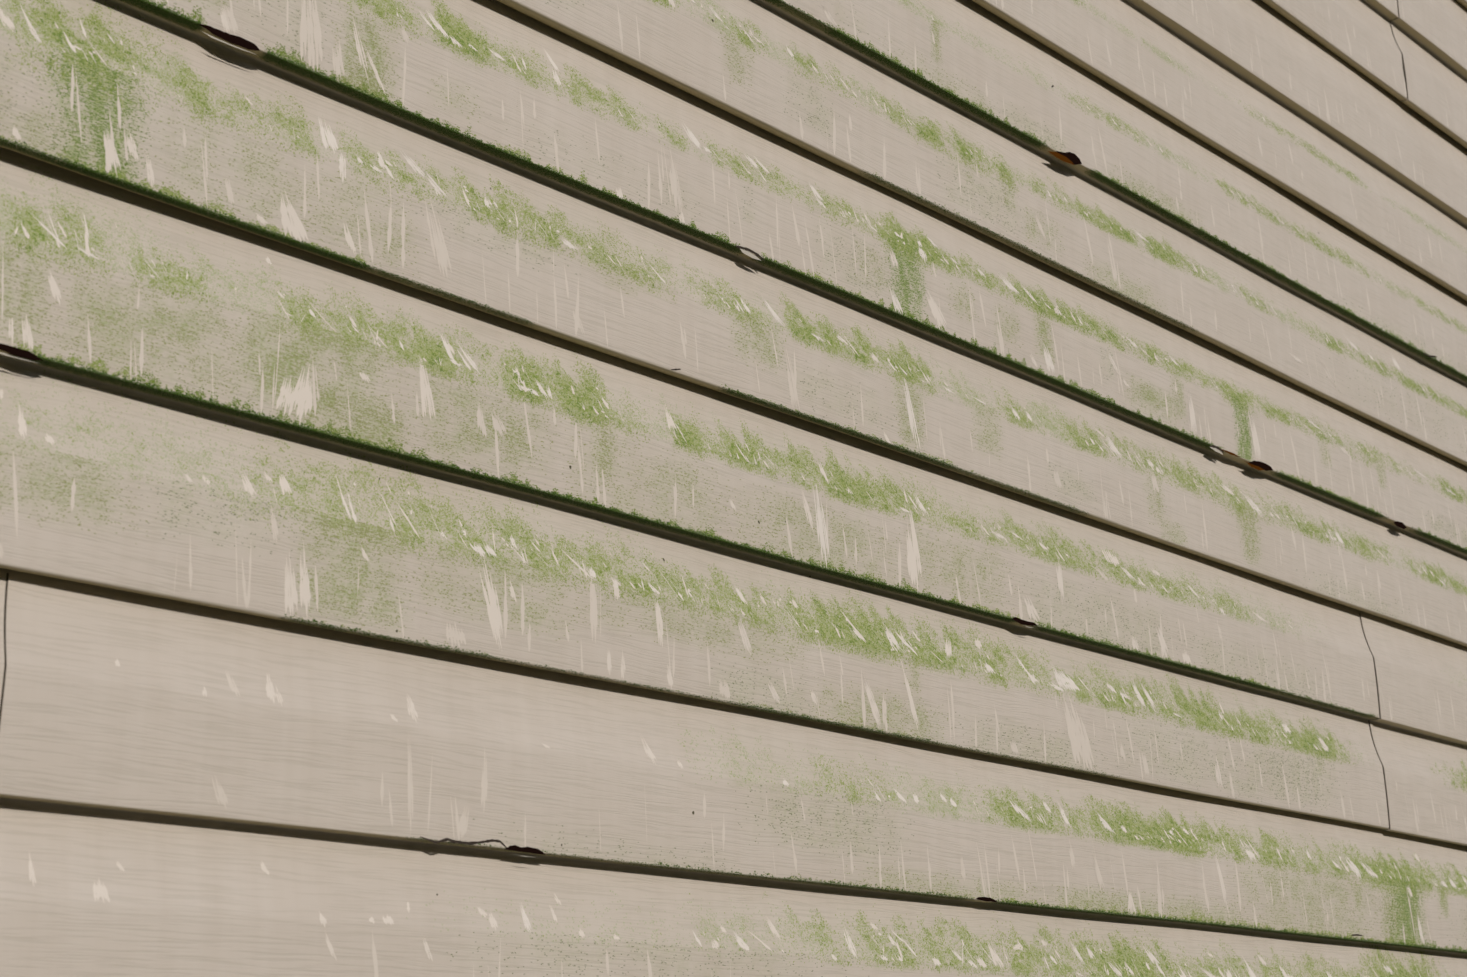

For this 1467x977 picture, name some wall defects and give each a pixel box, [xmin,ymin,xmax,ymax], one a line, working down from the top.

damp [0,3,137,145]
damp [104,84,154,187]
damp [287,0,527,105]
damp [259,291,480,432]
damp [504,363,556,457]
damp [698,284,988,458]
damp [769,182,1211,443]
damp [377,463,1003,740]
damp [1015,654,1181,779]
damp [831,923,1023,969]
damp [960,799,1336,935]
damp [1331,853,1467,945]